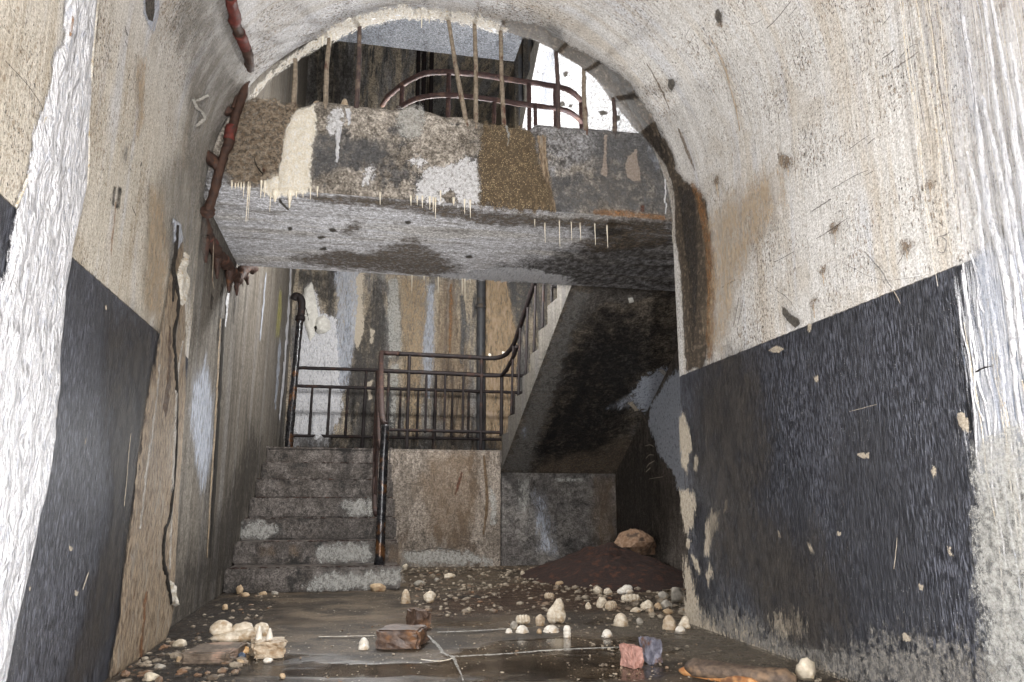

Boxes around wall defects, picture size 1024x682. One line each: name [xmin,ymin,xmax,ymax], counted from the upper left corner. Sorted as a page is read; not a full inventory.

crack [162,225,190,607]
spalling [600,133,608,177]
spalling [623,149,642,184]
leakage [249,0,1024,682]
corrosion [691,183,716,358]
peeling [618,367,853,682]